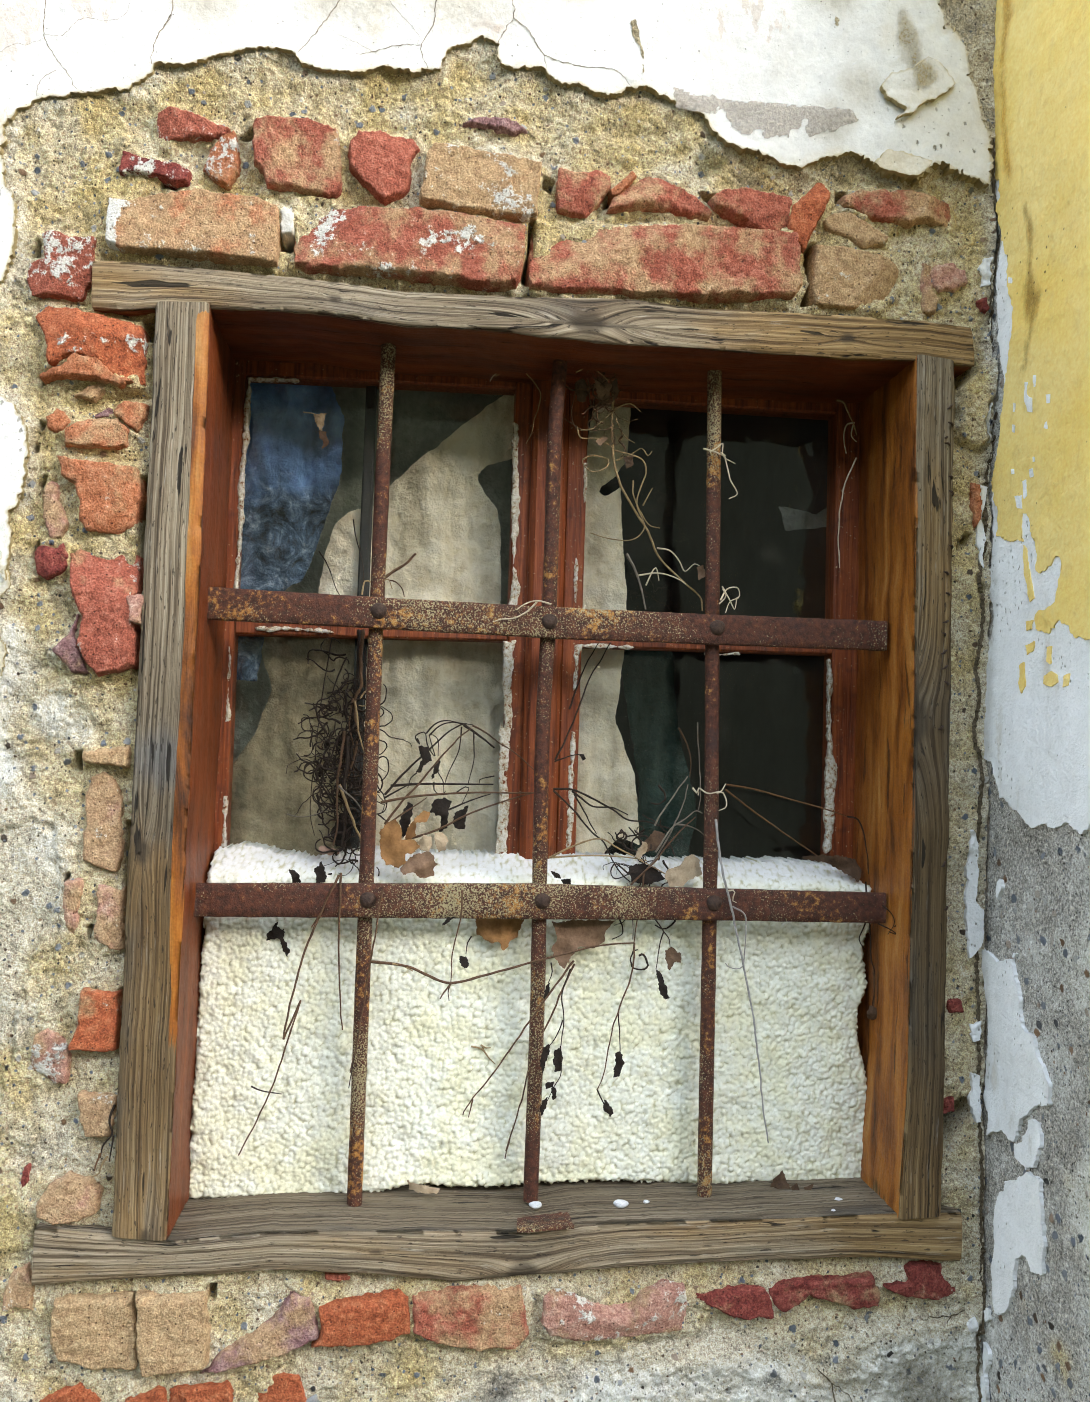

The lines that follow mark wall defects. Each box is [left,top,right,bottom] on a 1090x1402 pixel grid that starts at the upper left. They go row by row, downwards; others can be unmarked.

crack [1,0,130,96]
crack [151,0,173,64]
crack [299,0,437,68]
crack [497,0,630,85]
flaking render [879,0,997,132]
peeling [873,149,932,178]
peeling [996,241,1013,384]
peeling [0,395,30,580]
peeling [984,493,1090,788]
peeling [963,829,985,958]
flaking render [978,763,1090,1402]
crack [816,1368,852,1402]